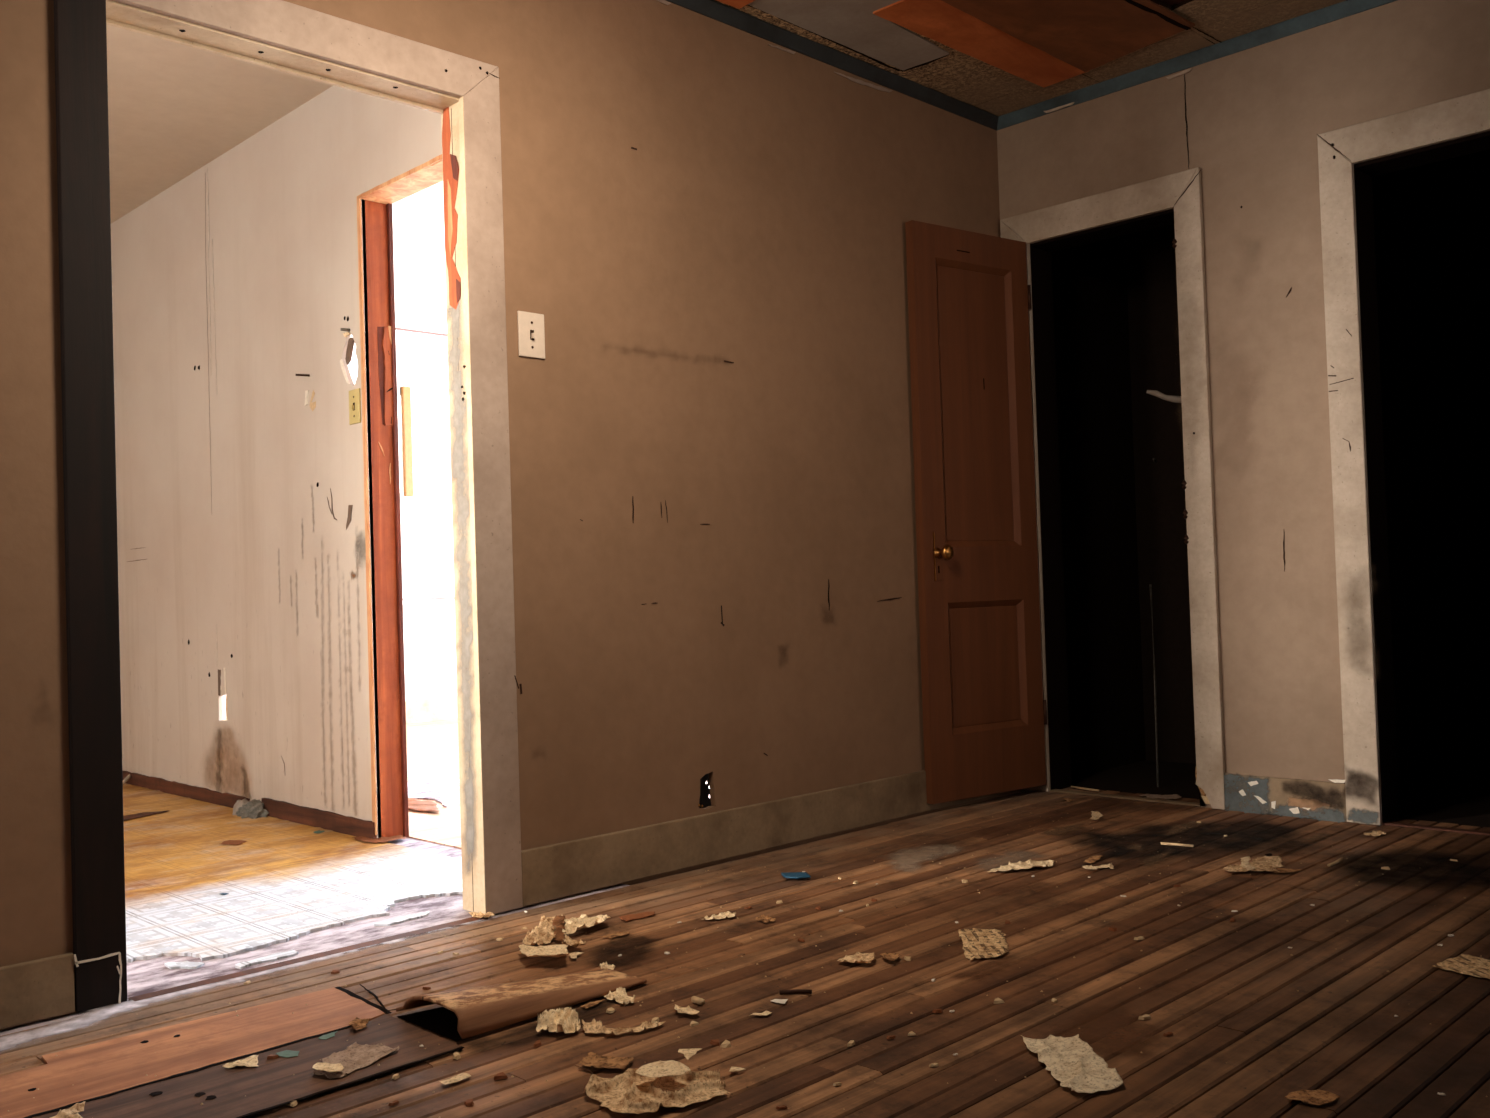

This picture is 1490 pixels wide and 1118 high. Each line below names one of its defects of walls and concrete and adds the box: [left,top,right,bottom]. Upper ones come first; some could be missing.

peeling [1224,774,1379,824]